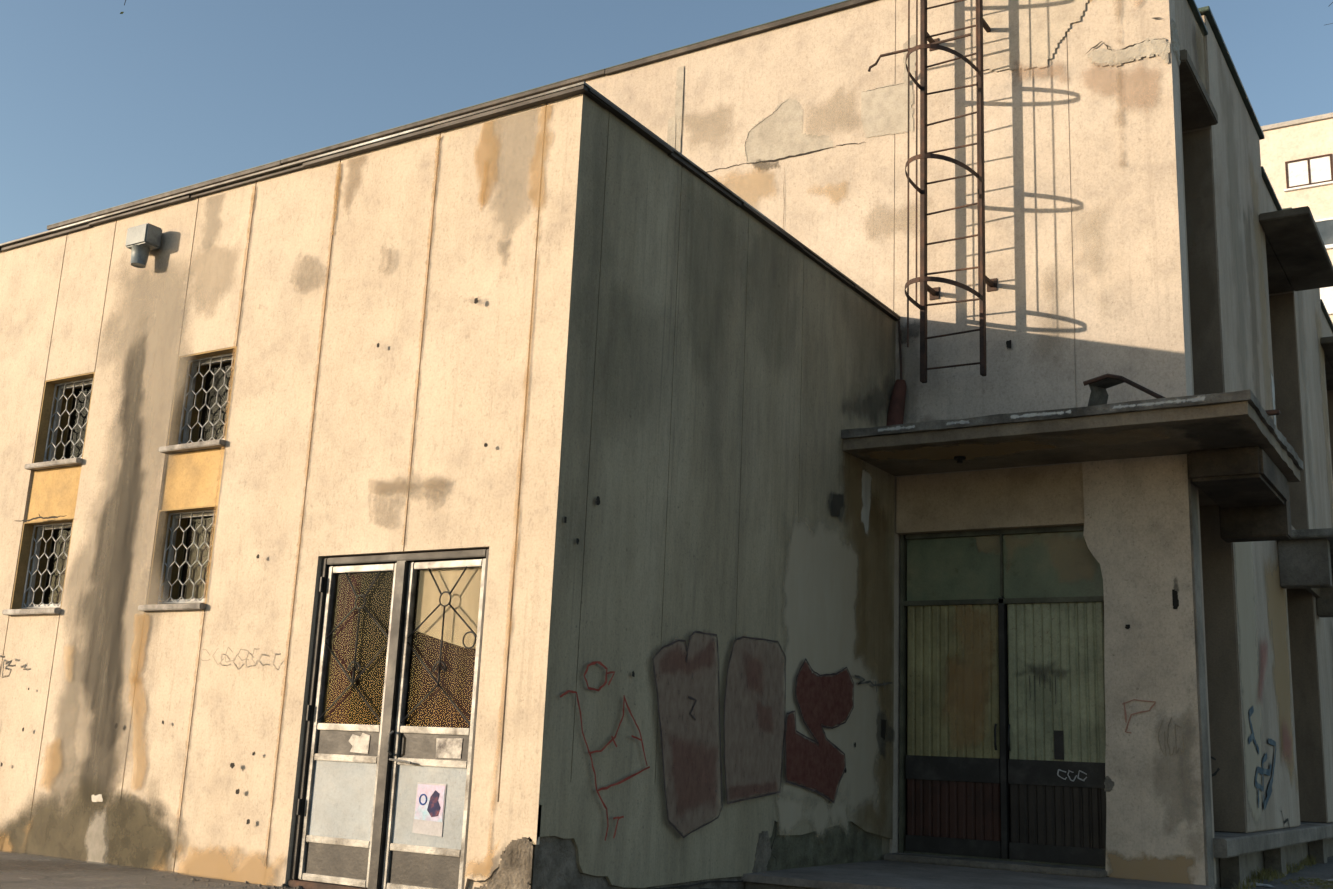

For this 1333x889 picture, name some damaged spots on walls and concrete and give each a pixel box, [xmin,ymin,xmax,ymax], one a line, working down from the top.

spalling [983,0,1088,72]
spalling [1087,17,1181,67]
spalling [745,98,833,170]
water stain [0,269,184,871]
peeling [767,493,895,871]
spalling [466,836,746,889]